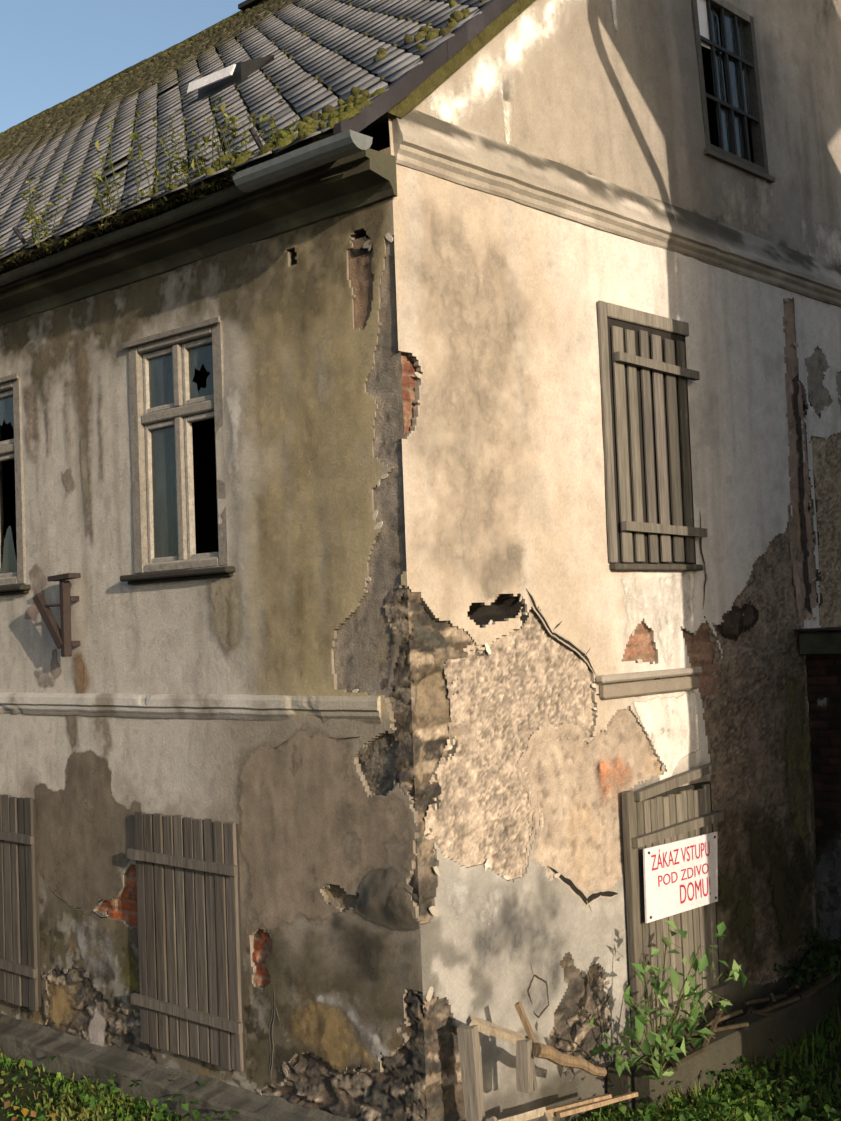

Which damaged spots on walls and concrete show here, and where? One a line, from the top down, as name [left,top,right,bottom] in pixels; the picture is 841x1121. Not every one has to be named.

damp [430,0,563,144]
damp [722,178,776,237]
damp [0,204,384,536]
flaking render [334,229,422,698]
flaking render [803,345,841,419]
flaking render [35,750,141,930]
flaking render [238,594,666,988]
flaking render [681,431,841,984]
flaking render [547,953,613,1081]